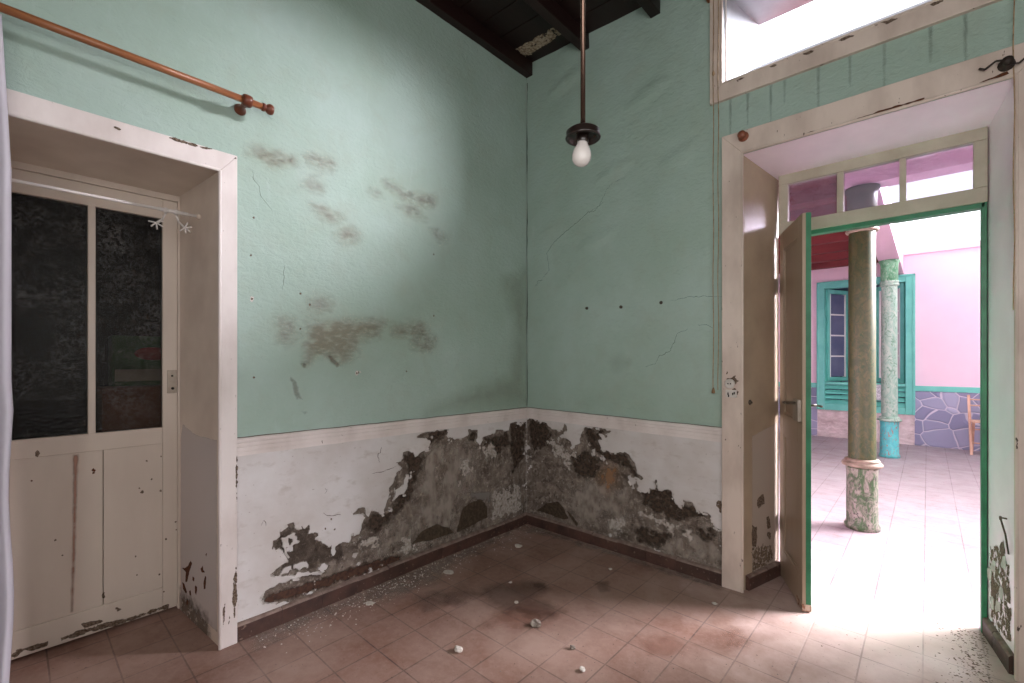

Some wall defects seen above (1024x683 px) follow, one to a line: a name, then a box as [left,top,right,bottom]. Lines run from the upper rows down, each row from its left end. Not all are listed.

crack [527,179,620,403]
spalling [259,418,722,605]
peeling [751,494,773,572]
peeling [12,641,48,658]
peeling [61,591,169,641]
peeling [182,553,207,605]
peeling [987,541,1012,642]